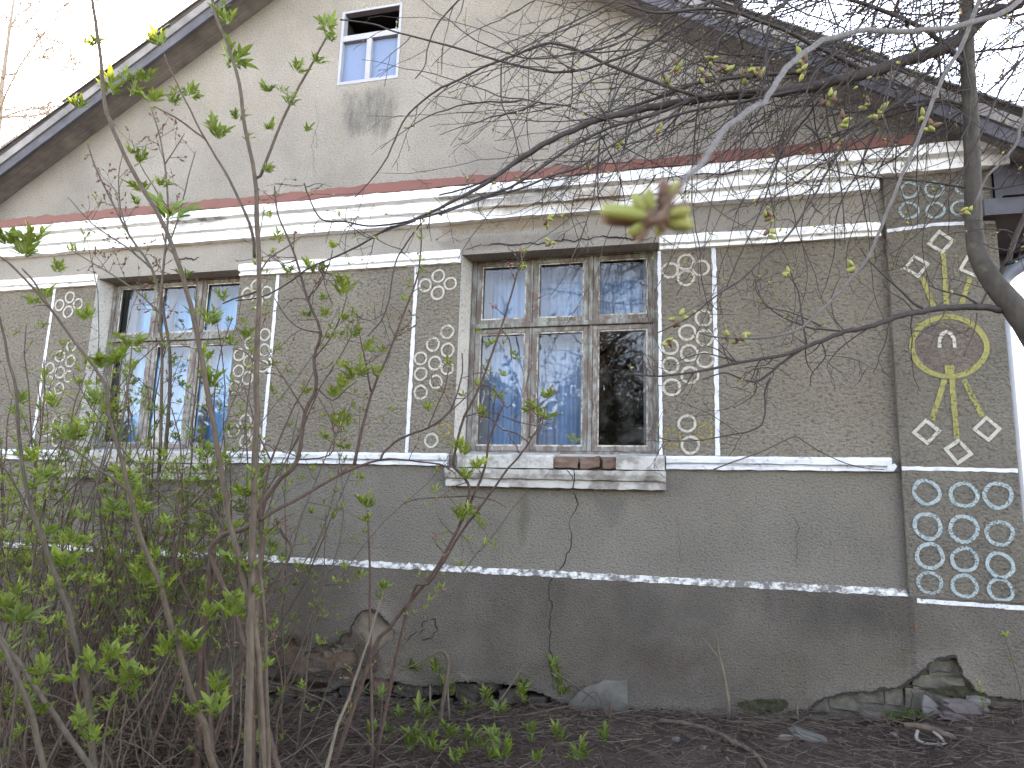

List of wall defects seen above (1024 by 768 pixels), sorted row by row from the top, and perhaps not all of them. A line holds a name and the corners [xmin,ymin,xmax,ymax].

crack [548,469,579,684]
spalling [273,609,400,694]
crack [269,608,438,679]
spalling [785,658,1024,720]